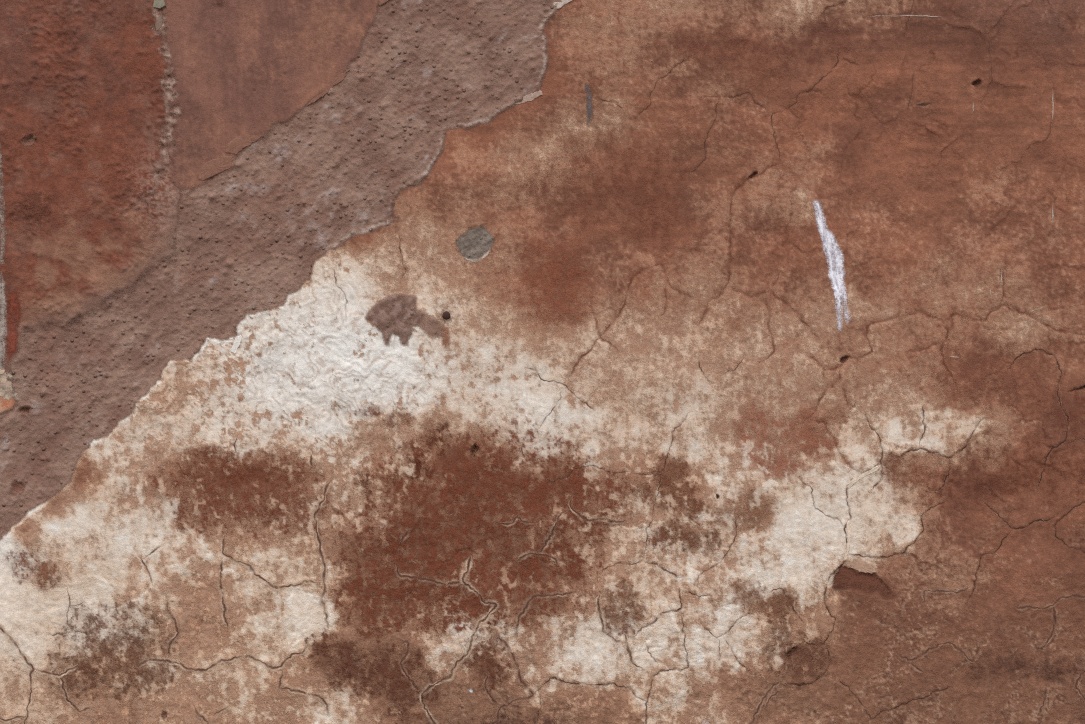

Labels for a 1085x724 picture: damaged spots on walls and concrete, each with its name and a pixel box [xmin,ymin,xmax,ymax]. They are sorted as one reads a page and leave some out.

crack [694,57,854,211]
crack [218,455,330,626]
spalling [0,0,573,539]
leakage [0,193,1085,724]
crack [396,426,745,724]
crack [538,279,632,414]
crack [751,410,974,724]
crack [922,505,1079,601]
crack [986,278,1085,482]
crack [0,624,88,724]
crack [153,603,331,724]